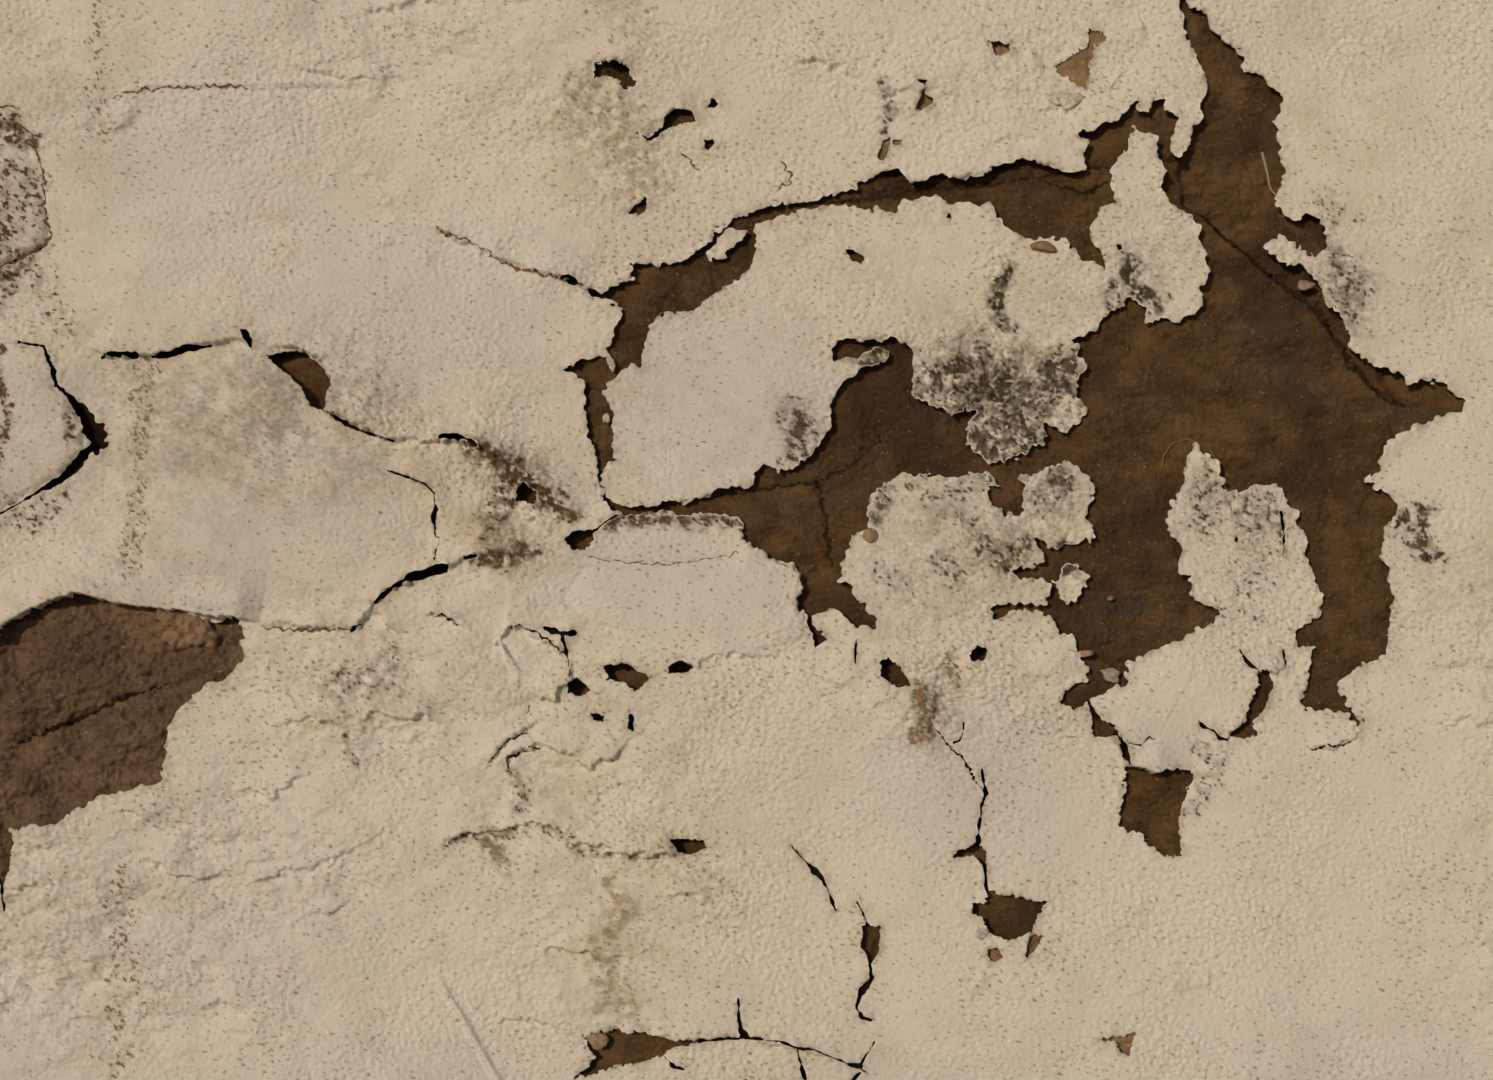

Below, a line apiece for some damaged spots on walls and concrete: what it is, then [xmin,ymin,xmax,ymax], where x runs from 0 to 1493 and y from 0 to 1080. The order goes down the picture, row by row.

crack [0,105,52,268]
crack [0,340,109,514]
peeling [240,329,331,413]
peeling [563,0,1465,857]
peeling [0,593,245,915]
peeling [574,1028,703,1079]
crack [662,961,875,1080]
crack [791,846,869,926]
peeling [860,924,881,963]
crack [936,722,989,892]